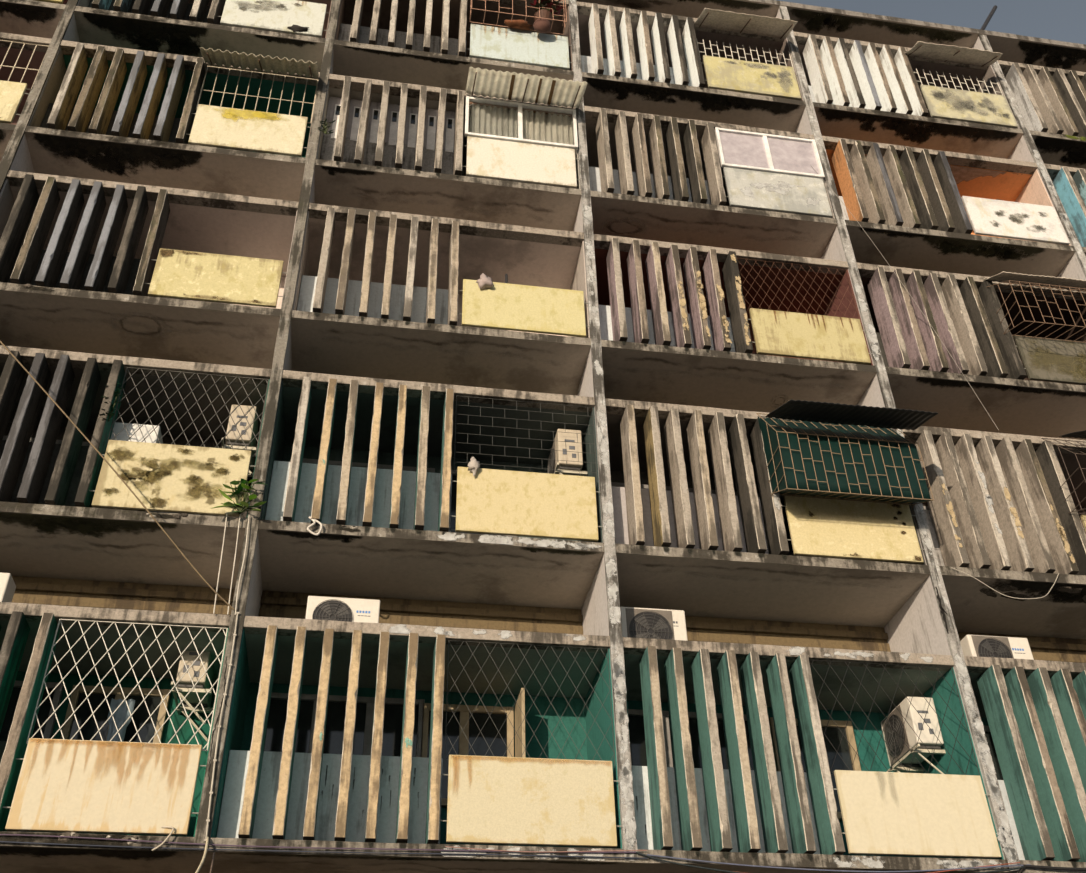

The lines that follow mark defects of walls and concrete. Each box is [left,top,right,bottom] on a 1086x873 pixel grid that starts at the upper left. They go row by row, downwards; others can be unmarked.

water stain [0,0,57,23]
water stain [1018,41,1086,69]
water stain [34,129,202,176]
water stain [861,228,1044,260]
peeling [678,281,689,330]
peeling [697,271,711,337]
peeling [735,276,751,345]
peeling [597,411,610,469]
water stain [104,448,242,508]
water stain [0,510,177,549]
peeling [603,499,615,537]
peeling [613,654,636,850]